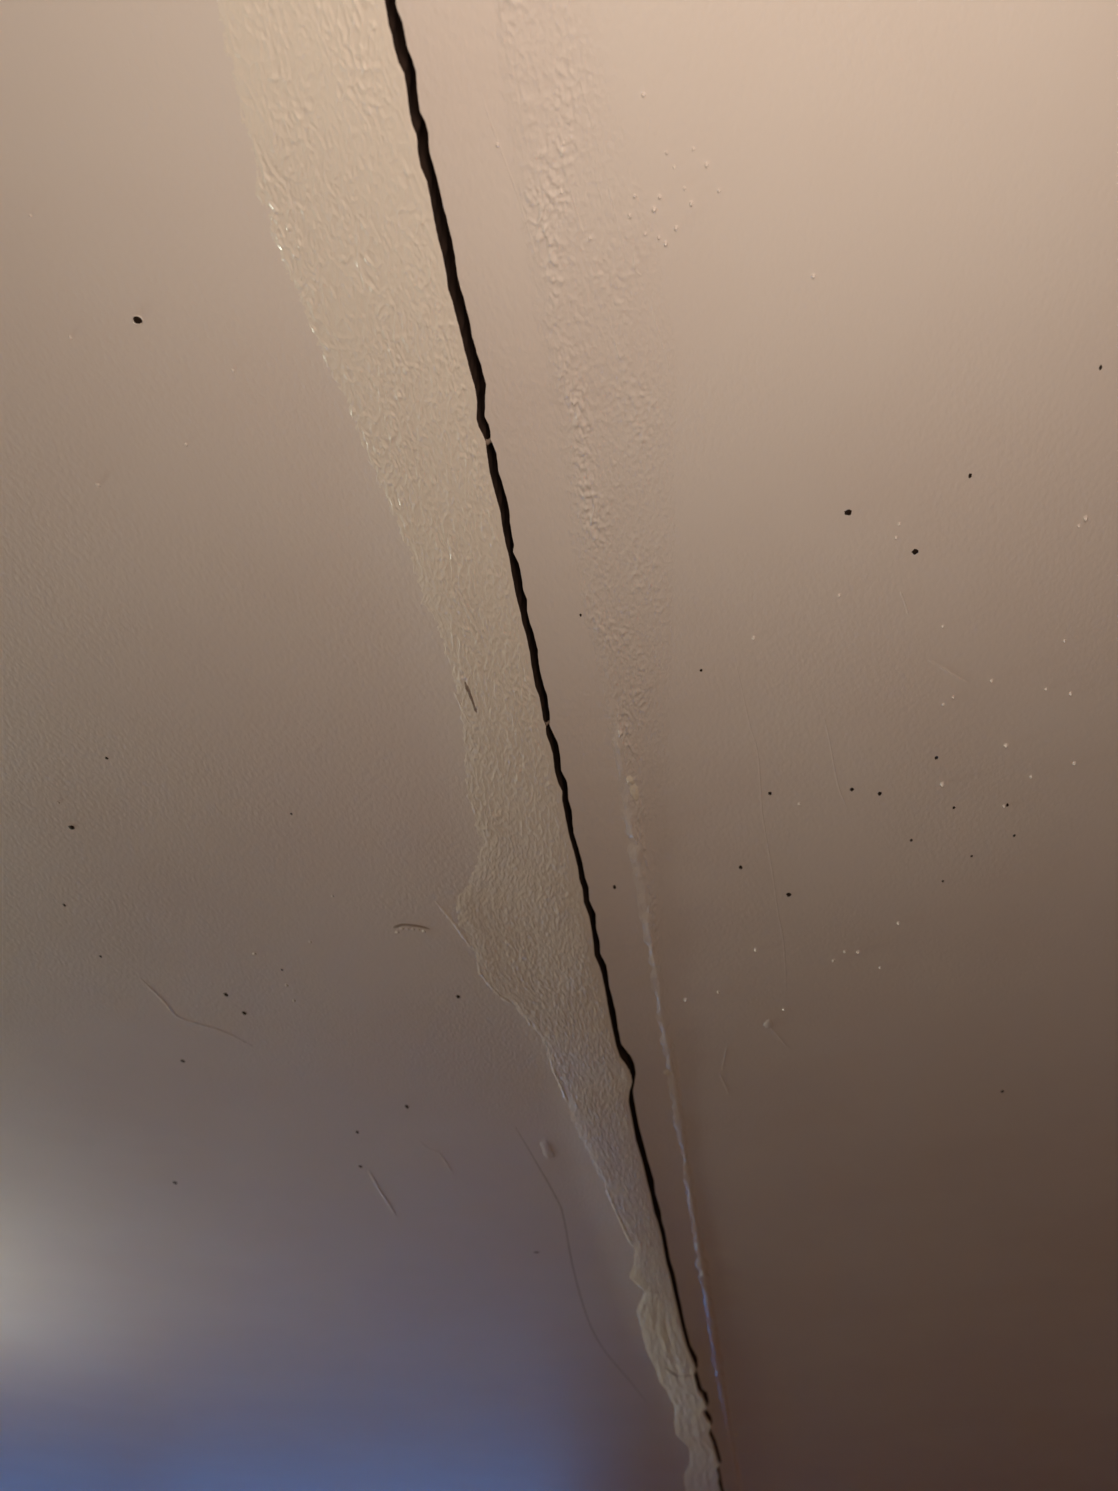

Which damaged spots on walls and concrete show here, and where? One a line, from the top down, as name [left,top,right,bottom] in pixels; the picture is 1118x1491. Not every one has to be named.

crack [385,0,724,1491]